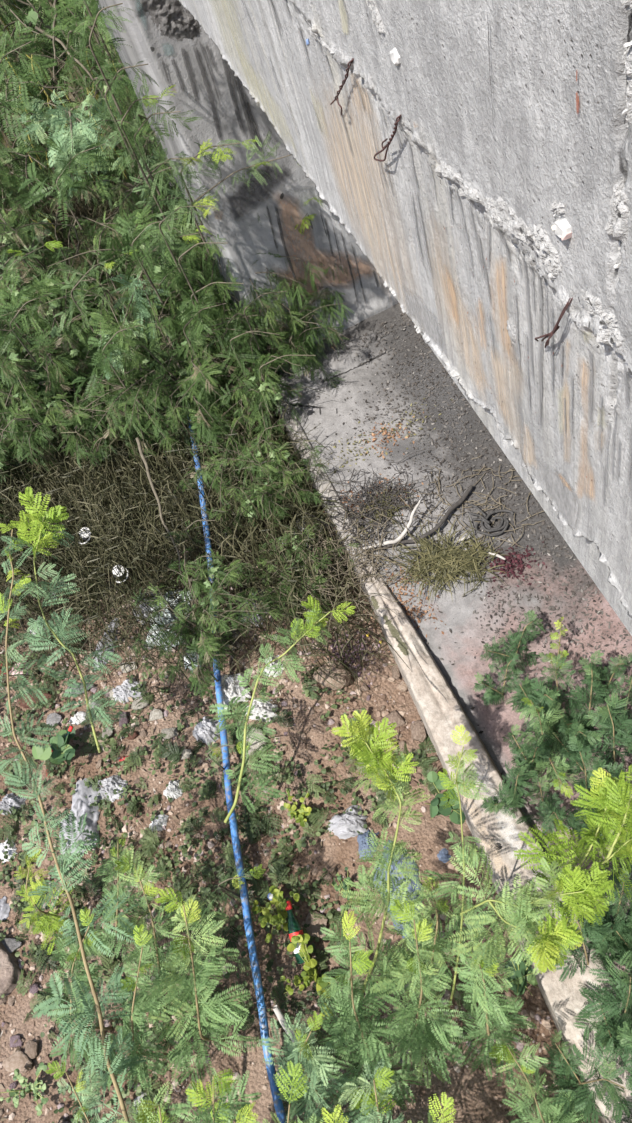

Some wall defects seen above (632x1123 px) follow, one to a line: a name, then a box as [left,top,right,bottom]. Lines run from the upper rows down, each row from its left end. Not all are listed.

peeling [390,48,401,66]
crack [605,0,632,275]